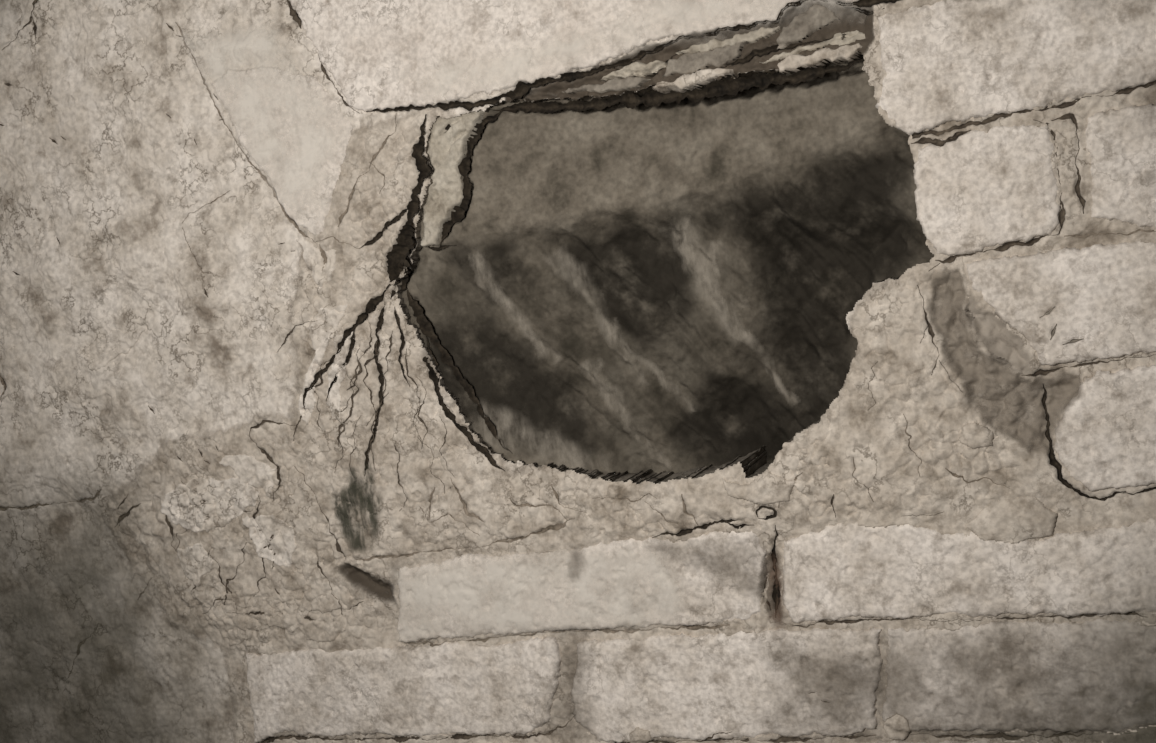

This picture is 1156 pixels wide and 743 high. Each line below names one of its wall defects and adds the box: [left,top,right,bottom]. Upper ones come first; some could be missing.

crack [2,0,37,50]
flaking render [280,236,336,292]
spalling [393,0,874,484]
crack [165,0,1156,628]
flaking render [298,303,355,425]
spalling [932,271,1080,449]
crack [0,490,141,527]
damp [335,470,379,549]
spalling [338,564,395,602]
spalling [761,553,782,618]